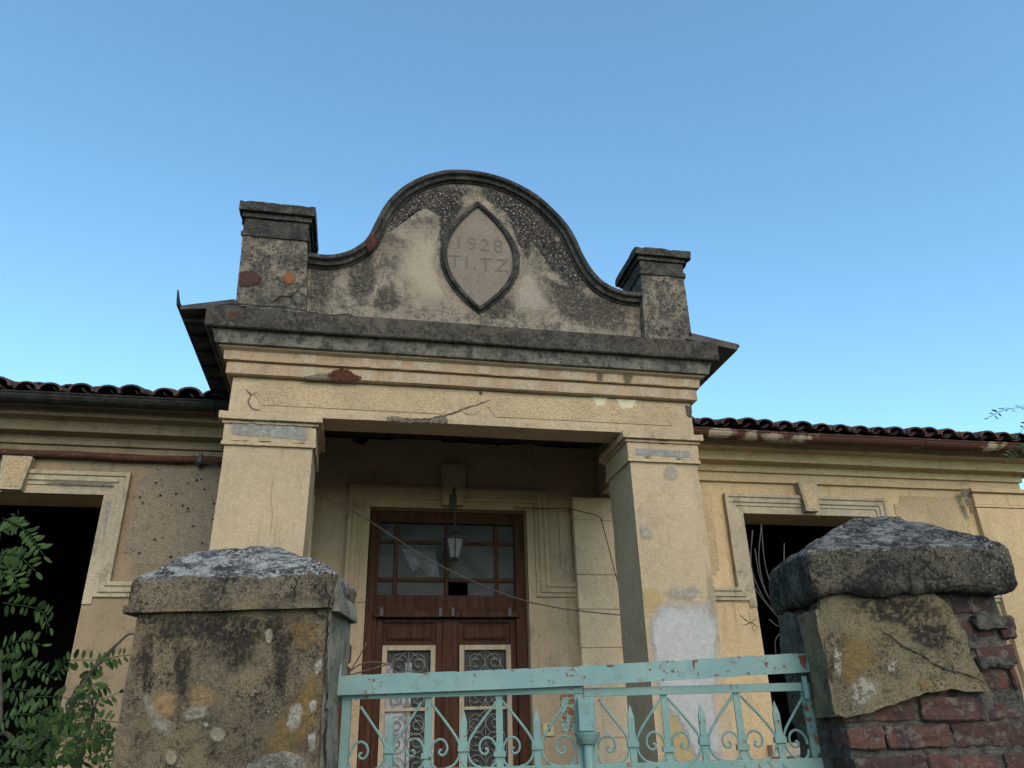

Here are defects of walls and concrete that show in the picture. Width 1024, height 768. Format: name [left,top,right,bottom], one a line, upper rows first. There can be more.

spalling [365,233,378,252]
spalling [240,270,261,287]
spalling [302,368,361,382]
crack [388,400,490,420]
peeling [231,423,306,440]
peeling [636,448,690,479]
crack [876,627,989,687]
damp [142,615,315,732]
damp [269,677,318,752]